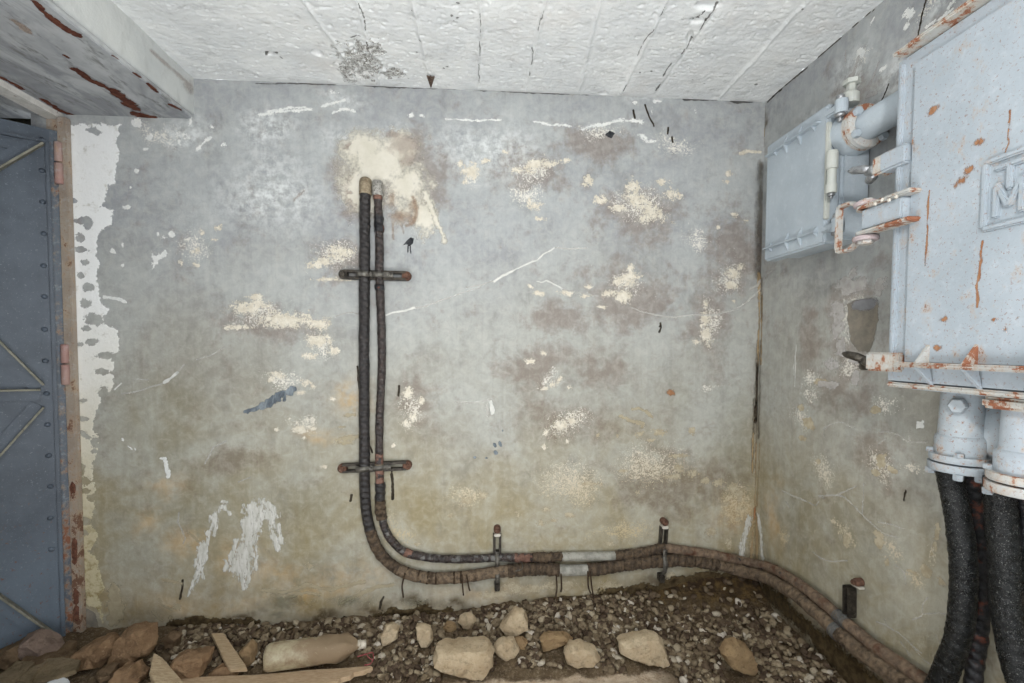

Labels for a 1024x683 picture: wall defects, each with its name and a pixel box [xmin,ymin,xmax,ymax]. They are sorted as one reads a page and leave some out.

corrosion [31,0,83,38]
corrosion [62,54,157,118]
spalling [258,38,409,117]
crack [623,1,718,143]
peeling [71,117,153,624]